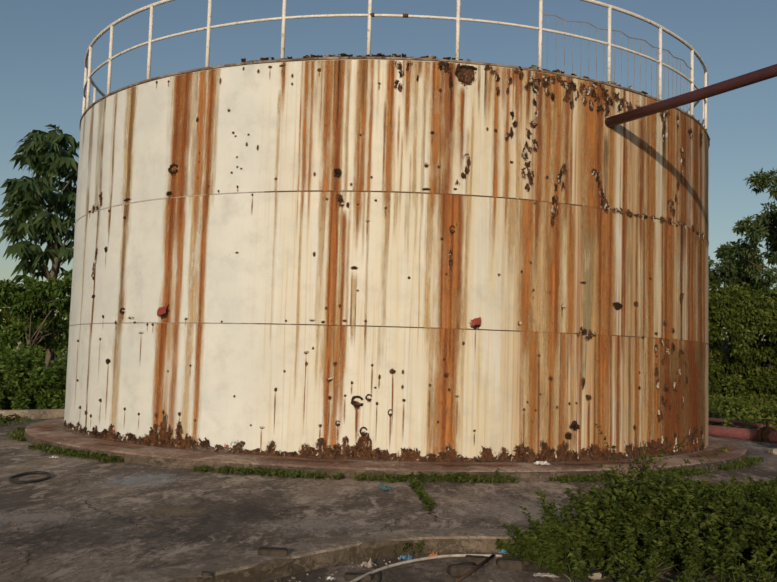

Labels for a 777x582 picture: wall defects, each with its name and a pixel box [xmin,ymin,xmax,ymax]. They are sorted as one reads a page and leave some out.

corrosion [37,60,732,466]